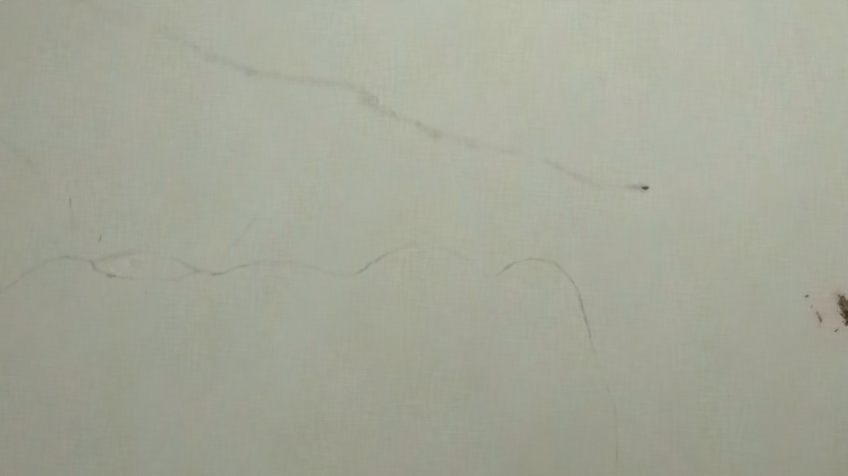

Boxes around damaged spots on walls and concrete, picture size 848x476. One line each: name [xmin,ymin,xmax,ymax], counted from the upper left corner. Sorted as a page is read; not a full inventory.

spalling [837,294,848,326]